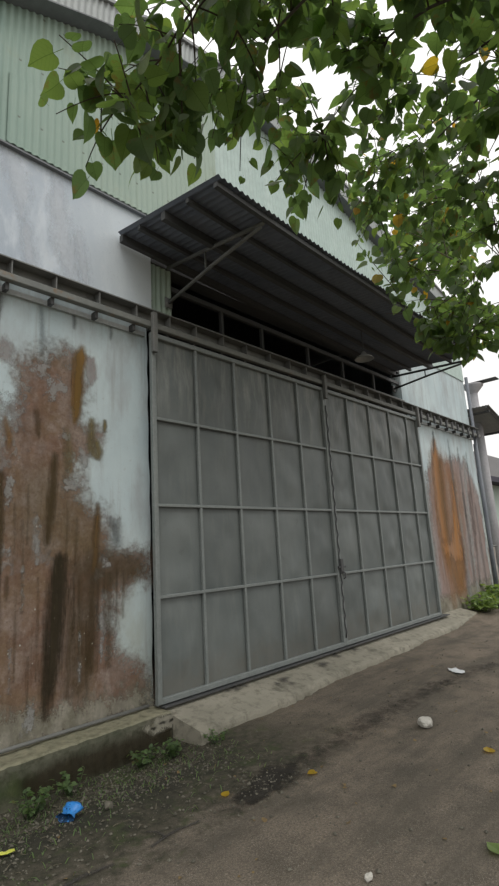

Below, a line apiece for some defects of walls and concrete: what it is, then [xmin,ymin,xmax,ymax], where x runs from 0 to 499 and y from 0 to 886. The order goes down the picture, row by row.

corrosion [72,347,96,423]
corrosion [88,418,107,459]
damp [46,453,57,544]
corrosion [432,440,465,593]
damp [41,554,67,717]